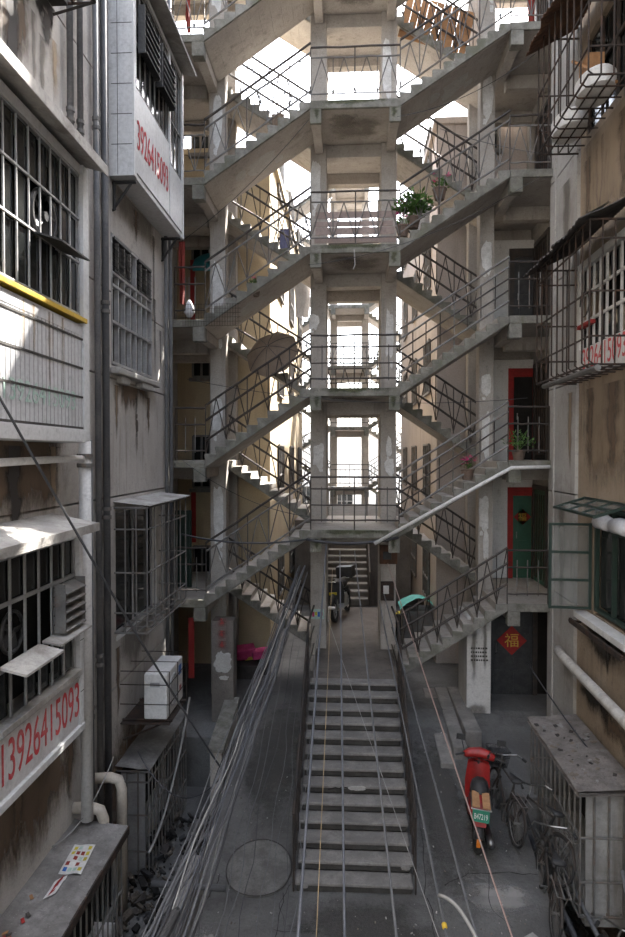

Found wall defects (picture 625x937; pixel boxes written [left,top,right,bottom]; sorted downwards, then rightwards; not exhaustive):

leakage [115,385,150,447]
leakage [586,368,625,475]
leakage [0,440,60,521]